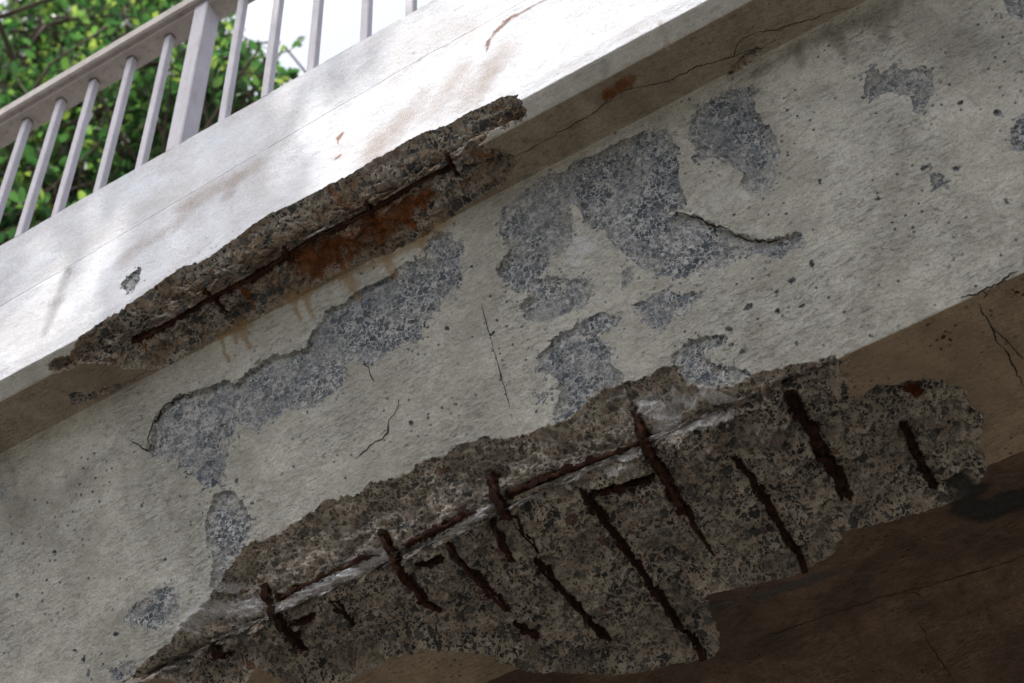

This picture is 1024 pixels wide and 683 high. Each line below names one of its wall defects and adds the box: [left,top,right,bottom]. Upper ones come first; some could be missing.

crack [464,6,854,167]
peeling [857,55,942,125]
rust [131,152,460,362]
crack [675,212,780,243]
crack [354,399,399,459]
crack [481,305,510,407]
spalling [47,94,988,683]
crack [964,271,1023,385]
rust [260,405,716,662]